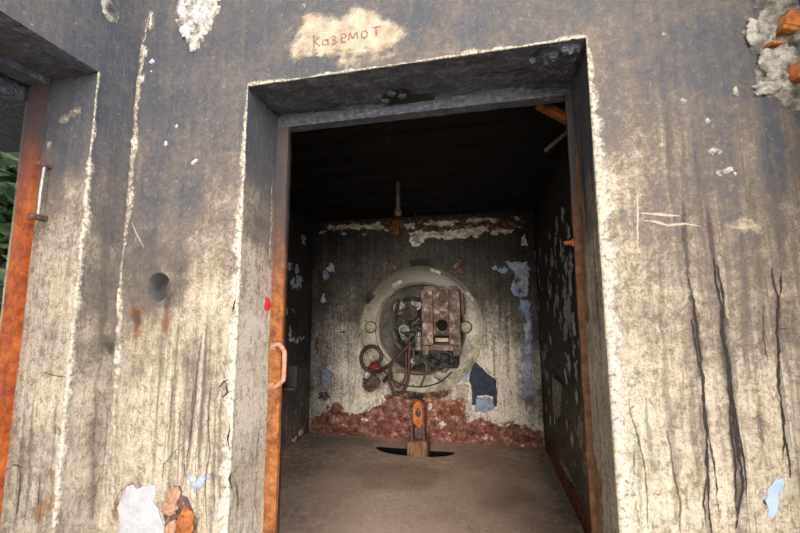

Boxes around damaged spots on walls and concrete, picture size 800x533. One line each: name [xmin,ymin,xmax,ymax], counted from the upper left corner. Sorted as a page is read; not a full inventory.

flaking render [174,0,221,52]
spalling [741,0,800,111]
rust [132,307,143,339]
flaking render [109,11,209,533]
peeling [284,207,587,493]
crack [686,258,747,533]
peeling [764,479,785,518]
crack [763,268,791,478]